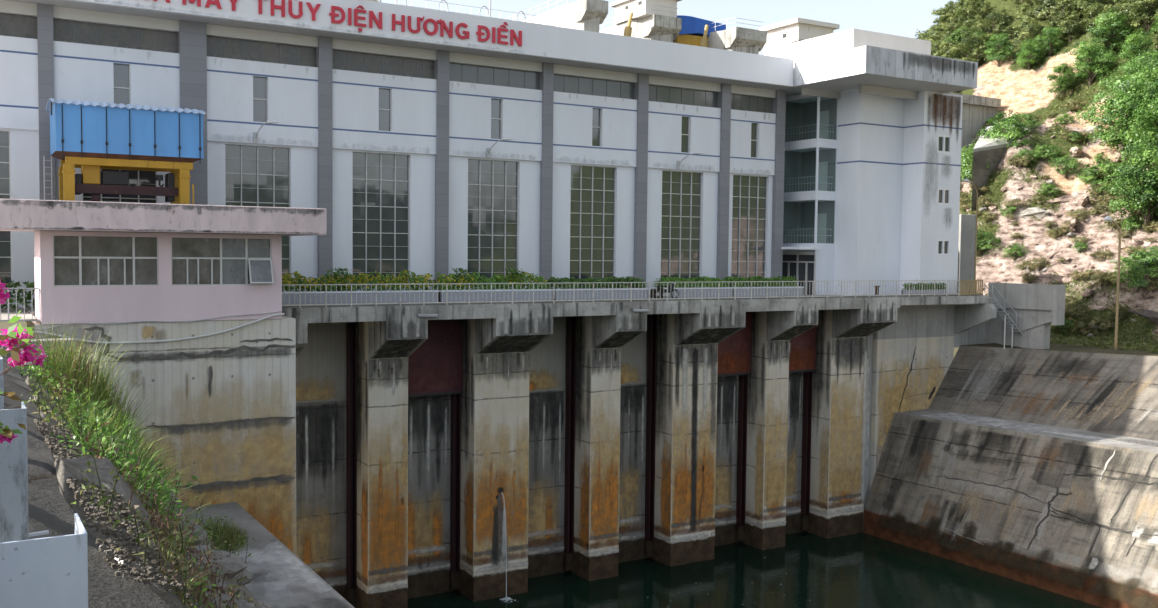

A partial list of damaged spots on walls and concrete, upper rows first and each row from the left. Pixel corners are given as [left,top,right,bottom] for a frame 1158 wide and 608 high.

crack [898,347,936,412]
corrosion [361,464,442,581]
corrosion [464,469,556,553]
corrosion [580,459,638,549]
leakage [137,304,1134,595]
corrosion [661,452,729,533]
crack [936,452,1158,569]